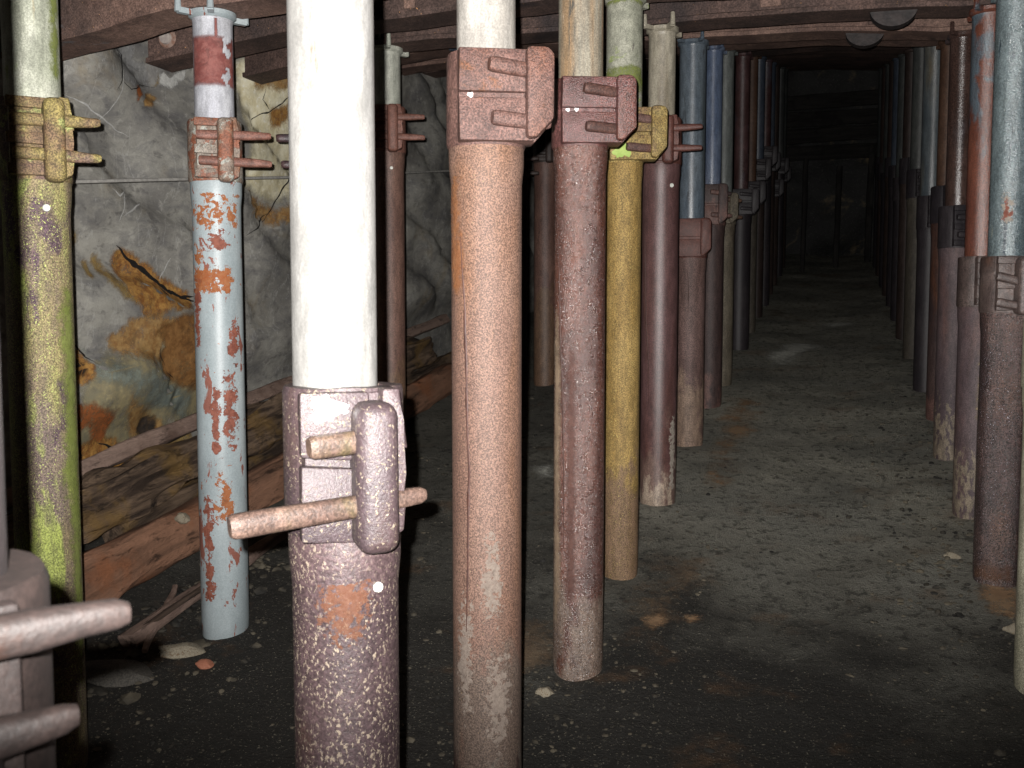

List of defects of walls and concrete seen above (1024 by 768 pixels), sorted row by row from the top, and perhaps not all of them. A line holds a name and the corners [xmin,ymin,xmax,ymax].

rust [451,176,463,290]
crack [116,245,194,302]
rust [315,579,377,649]